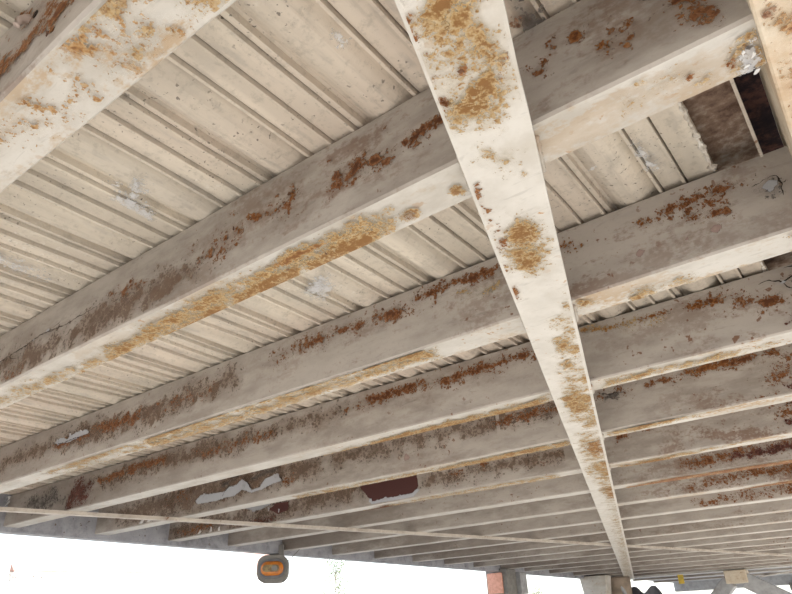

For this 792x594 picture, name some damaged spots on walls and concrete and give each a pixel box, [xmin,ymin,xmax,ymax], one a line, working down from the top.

corrosion [0,0,74,77]
corrosion [724,0,792,76]
corrosion [326,0,585,198]
crack [752,175,786,199]
corrosion [0,183,421,404]
corrosion [268,182,583,370]
corrosion [683,284,792,314]
crack [758,266,792,288]
peeling [53,429,89,445]
corrosion [105,293,792,577]
peeling [196,467,283,504]
peeling [360,475,419,504]